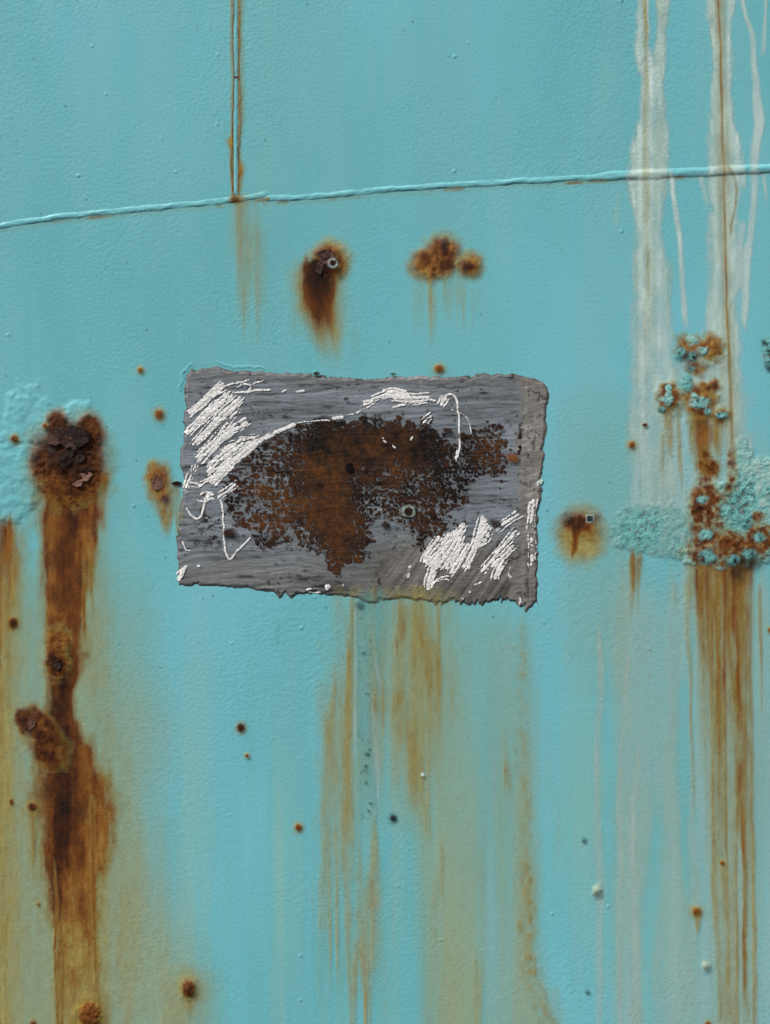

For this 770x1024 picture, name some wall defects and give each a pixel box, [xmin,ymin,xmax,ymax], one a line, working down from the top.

corrosion [300,240,349,333]
corrosion [409,235,482,308]
damp [628,0,767,524]
corrosion [656,332,730,474]
corrosion [144,460,177,529]
corrosion [200,413,529,577]
corrosion [558,510,602,559]
corrosion [0,410,115,1024]
corrosion [689,561,770,1024]
corrosion [353,939,373,1024]